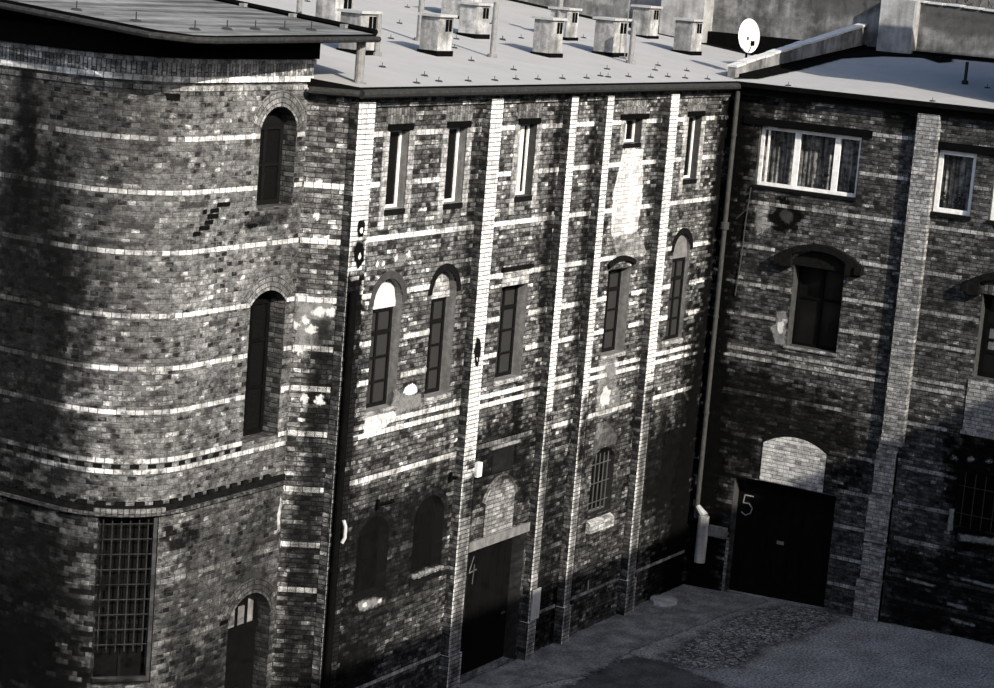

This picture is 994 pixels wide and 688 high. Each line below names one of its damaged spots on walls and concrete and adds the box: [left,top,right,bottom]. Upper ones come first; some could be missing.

peeling [611,148,647,264]
spalling [292,297,335,358]
flaking render [771,311,787,345]
spalling [300,393,325,405]